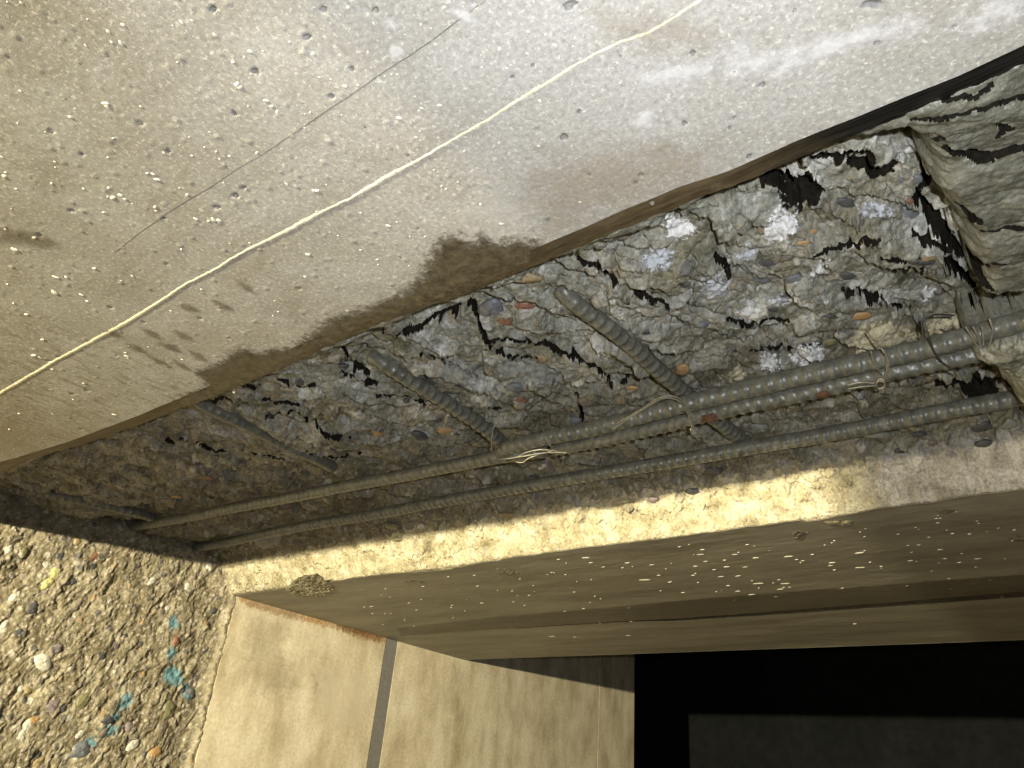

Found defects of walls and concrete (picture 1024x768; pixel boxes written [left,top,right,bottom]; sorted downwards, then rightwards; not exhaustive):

water stain [641,211,700,272]
water stain [736,200,799,261]
water stain [854,198,894,219]
water stain [172,232,539,408]
crack [339,346,427,407]
spalling [0,126,984,532]
crack [382,297,634,390]
crack [576,255,671,311]
water stain [734,293,793,323]
water stain [727,342,829,383]
water stain [845,313,962,354]
spalling [0,310,1024,768]